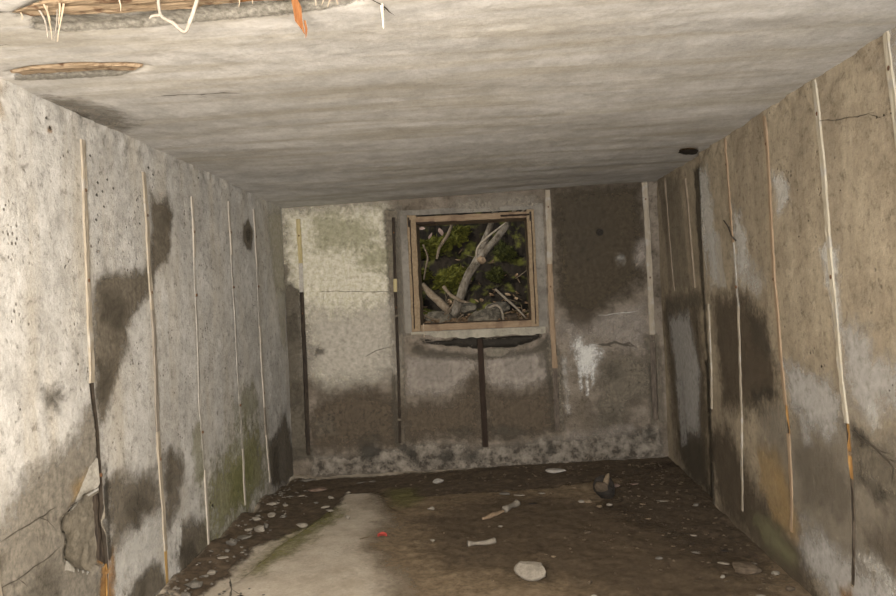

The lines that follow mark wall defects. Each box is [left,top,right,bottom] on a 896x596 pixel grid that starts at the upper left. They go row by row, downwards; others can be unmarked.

spalling [10,62,143,80]
spalling [12,0,358,41]
spalling [61,458,108,573]
leakage [0,193,207,596]
corrosion [97,555,116,596]
leakage [268,209,587,488]
leakage [551,182,665,438]
leakage [670,168,896,596]